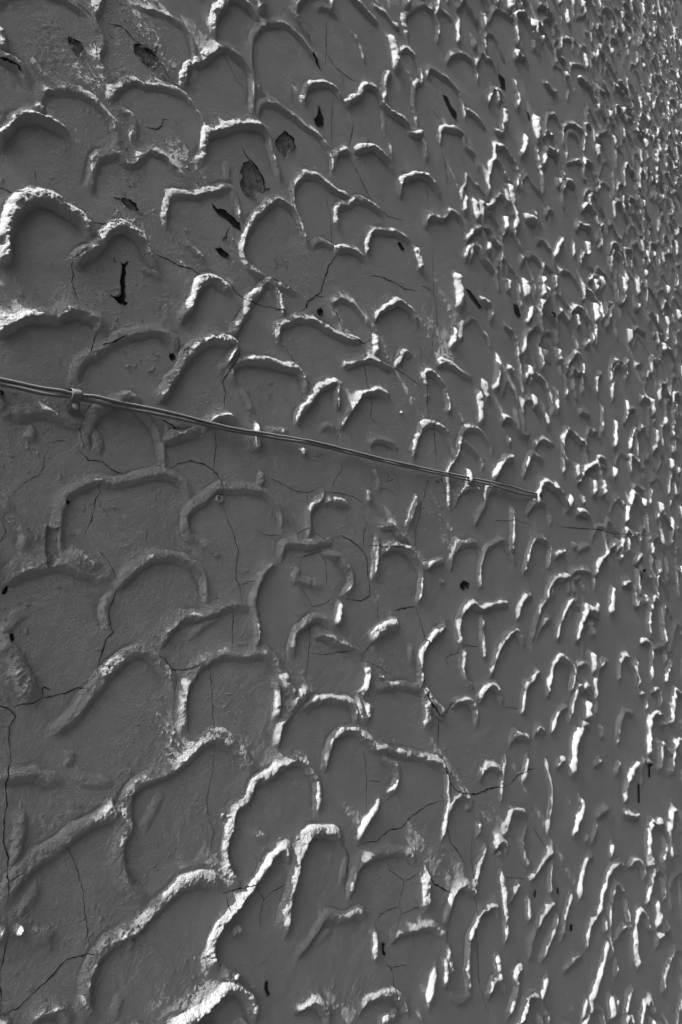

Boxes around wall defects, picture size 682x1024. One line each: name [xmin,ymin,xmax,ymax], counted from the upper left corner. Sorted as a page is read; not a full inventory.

flaking render [68,36,84,58]
flaking render [134,44,158,70]
flaking render [275,131,296,158]
flaking render [240,147,270,200]
flaking render [114,191,139,211]
crack [156,191,535,1010]
crack [0,428,123,908]
crack [0,848,101,1016]